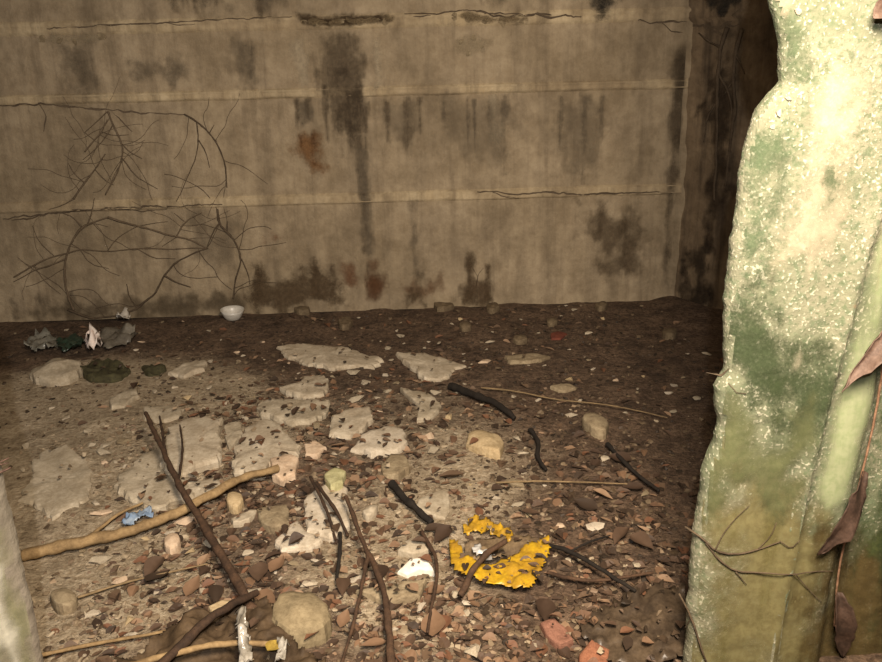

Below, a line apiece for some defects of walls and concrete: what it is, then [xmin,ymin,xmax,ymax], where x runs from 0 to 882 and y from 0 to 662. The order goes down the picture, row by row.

water stain [299,14,384,25]
crack [404,9,581,19]
water stain [323,36,380,130]
water stain [670,53,686,146]
water stain [359,149,372,252]
crack [477,190,672,198]
water stain [681,70,733,305]
water stain [208,267,341,313]
corrosion [366,276,384,299]
water stain [462,253,492,305]
water stain [800,528,882,662]